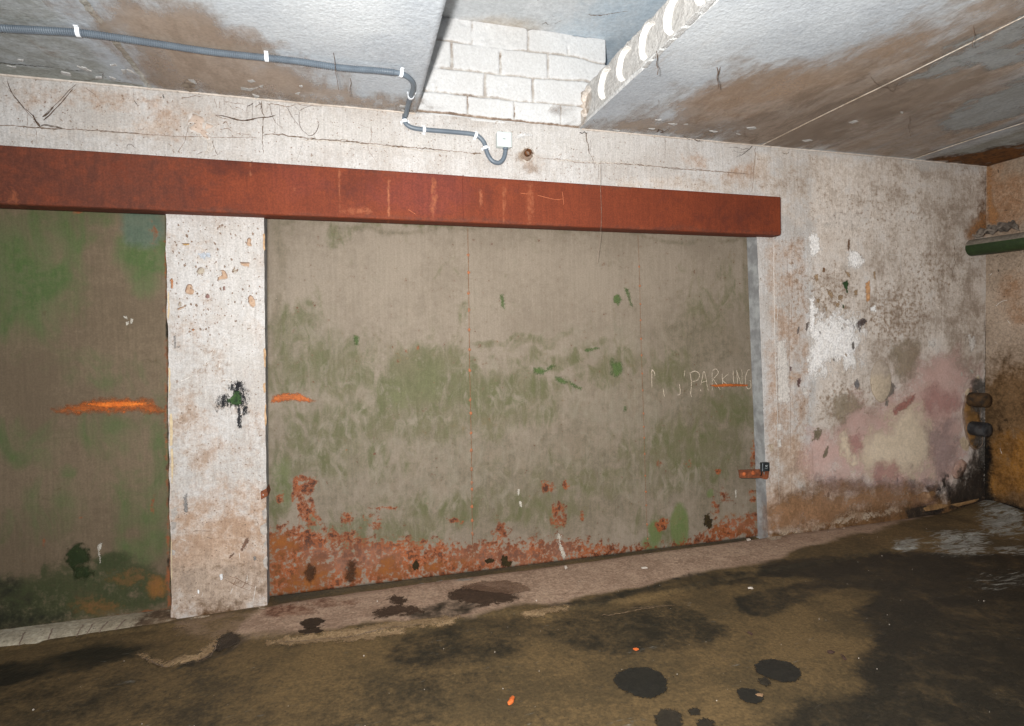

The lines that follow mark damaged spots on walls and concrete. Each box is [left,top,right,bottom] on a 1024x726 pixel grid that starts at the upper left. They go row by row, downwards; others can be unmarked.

water stain [95,0,417,112]
water stain [615,0,1024,148]